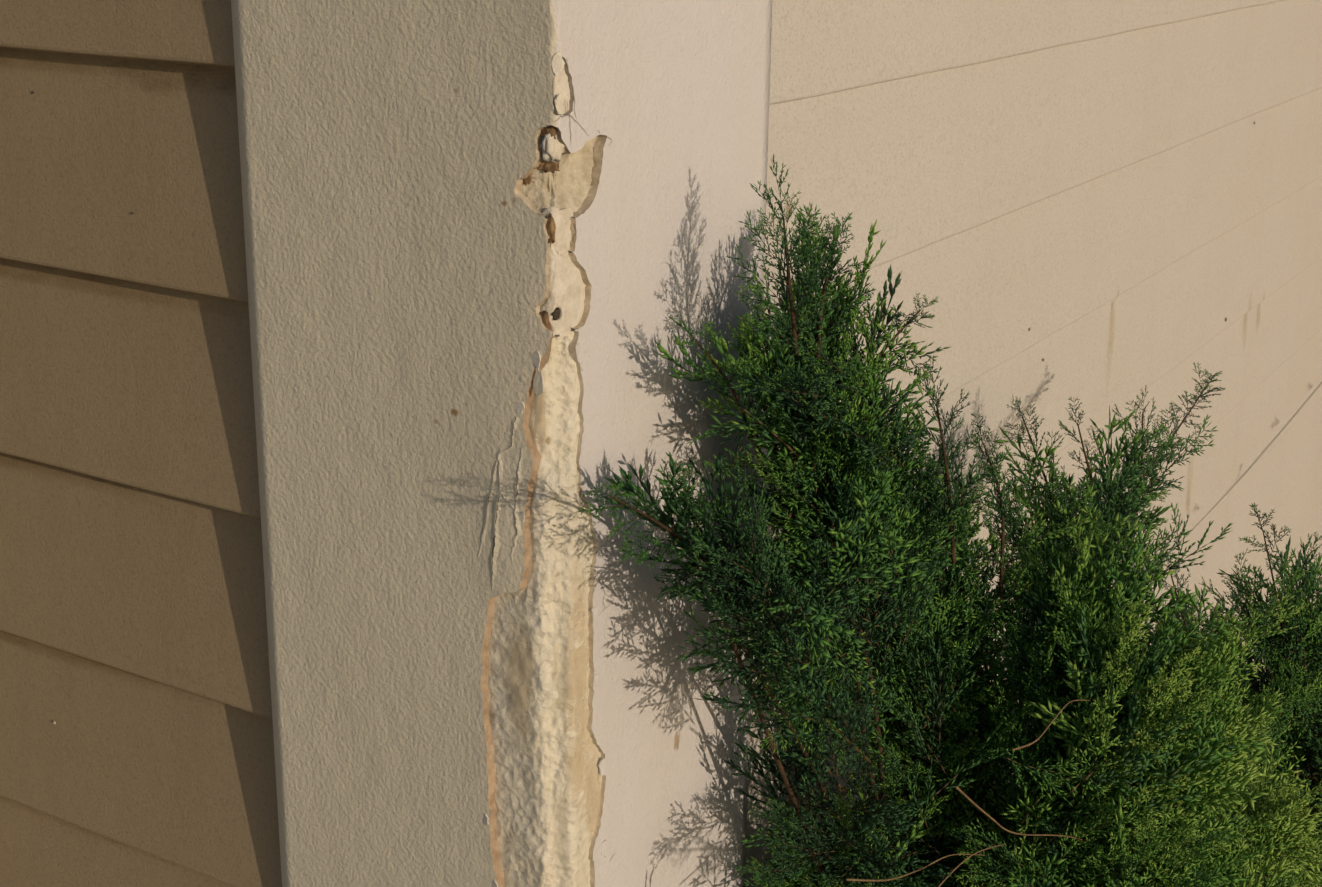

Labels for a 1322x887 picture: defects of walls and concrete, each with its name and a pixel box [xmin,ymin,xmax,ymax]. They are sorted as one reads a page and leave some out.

crack [477,416,524,591]
spalling [481,51,608,887]